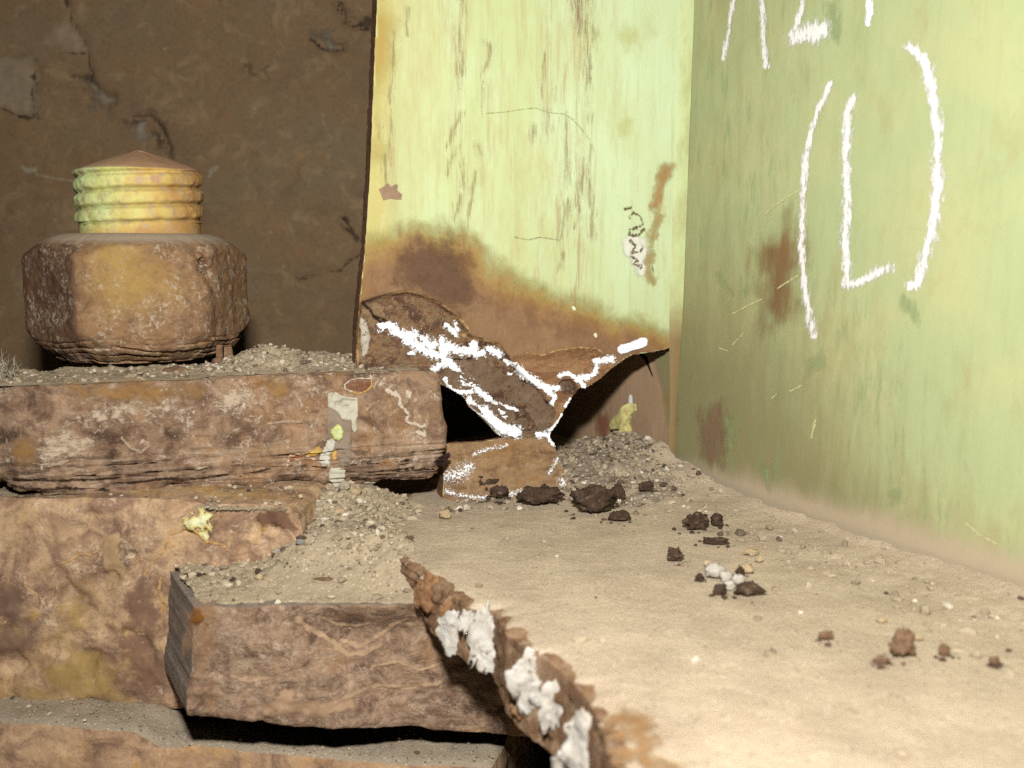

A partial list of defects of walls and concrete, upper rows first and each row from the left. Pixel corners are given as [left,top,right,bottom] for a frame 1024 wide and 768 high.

corrosion [644,163,673,285]
corrosion [762,234,793,316]
spalling [356,292,555,439]
corrosion [344,224,678,473]
hole [558,379,578,394]
peeling [609,403,637,433]